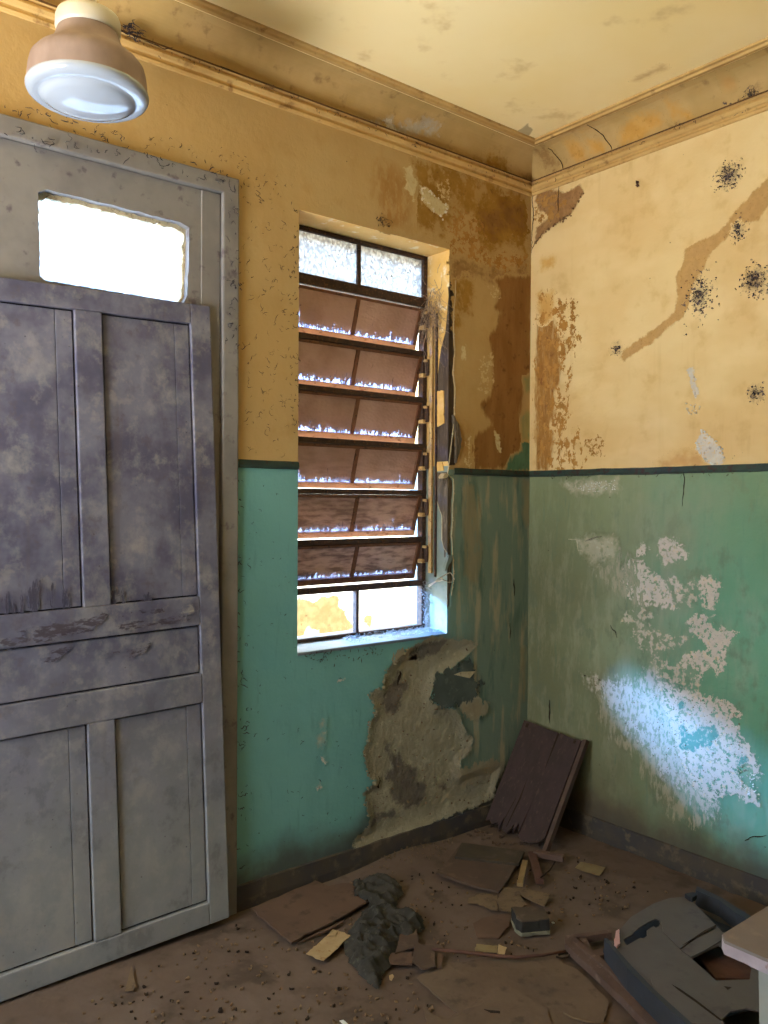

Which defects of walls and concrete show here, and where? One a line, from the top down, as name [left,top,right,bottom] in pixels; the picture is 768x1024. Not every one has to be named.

water stain [517,56,746,175]
peeling [403,155,451,221]
water stain [370,155,531,286]
water stain [472,145,512,172]
peeling [532,183,585,244]
water stain [620,177,768,363]
water stain [521,373,530,395]
water stain [519,408,530,443]
peeling [695,429,726,465]
peeling [570,530,765,832]
flaking render [352,635,505,849]